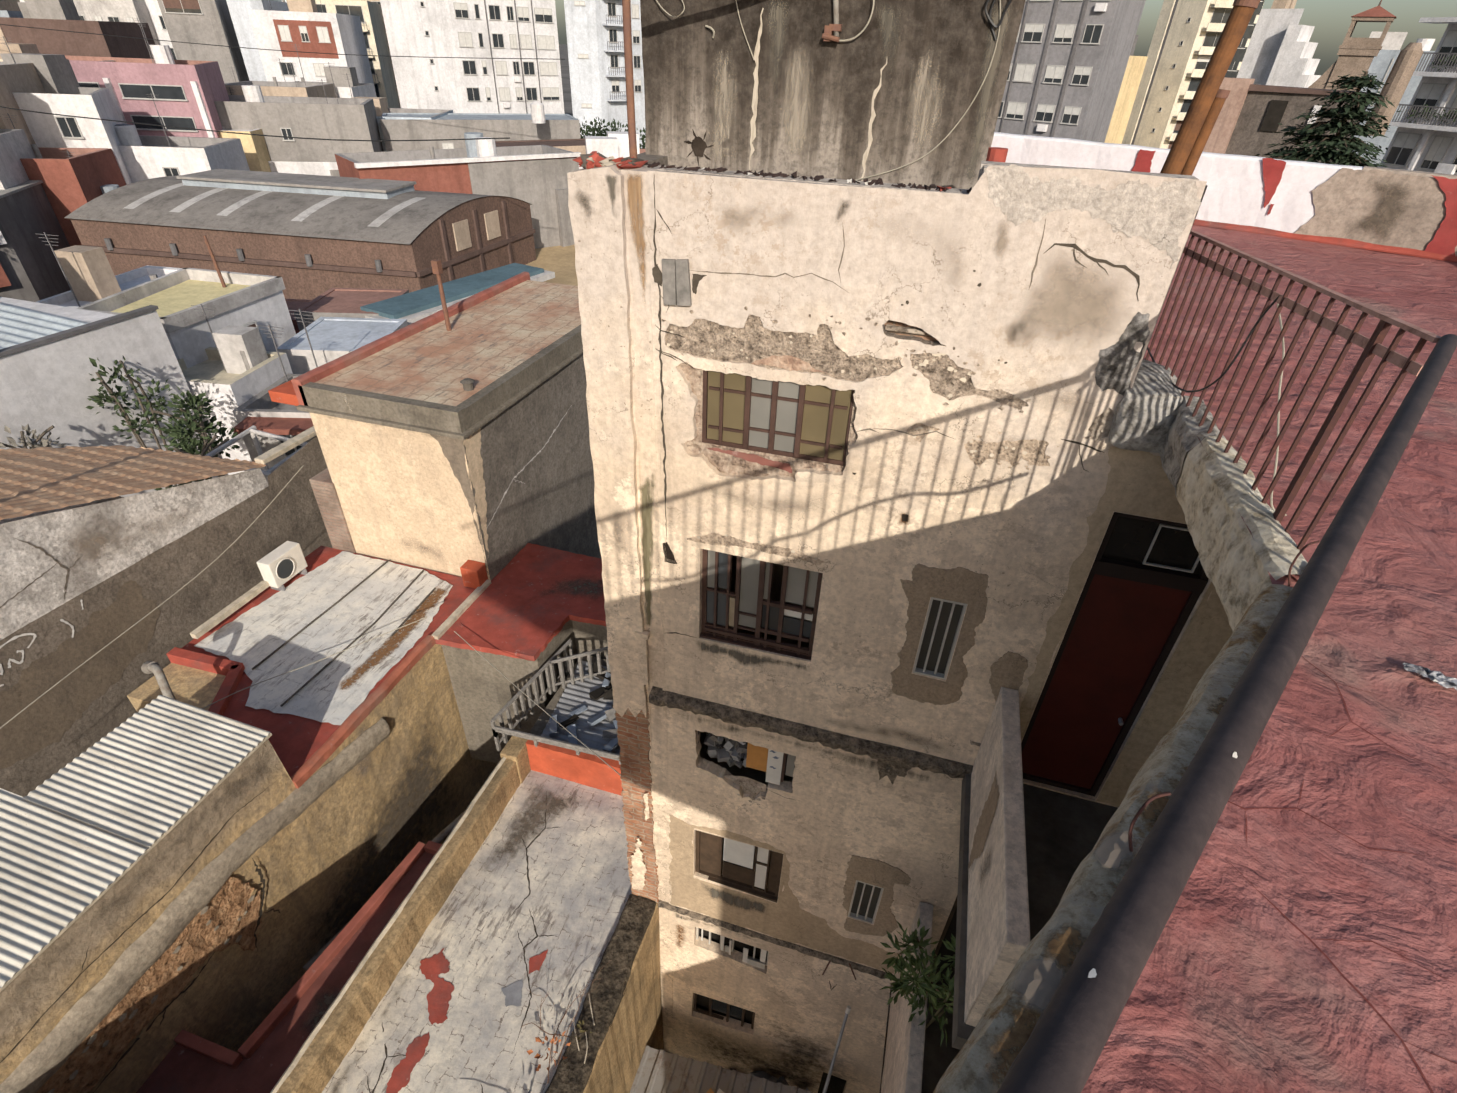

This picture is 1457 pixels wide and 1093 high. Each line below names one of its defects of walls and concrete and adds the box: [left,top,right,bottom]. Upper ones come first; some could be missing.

leakage [714,61,730,156]
leakage [749,2,807,169]
crack [861,60,887,181]
leakage [968,9,1008,180]
corrosion [627,175,645,288]
crack [1029,219,1140,299]
leakage [1359,185,1407,235]
spalling [649,274,1031,478]
crack [0,777,281,1063]
spalling [36,876,262,1093]
peeling [386,948,454,1093]
peeling [669,814,902,973]